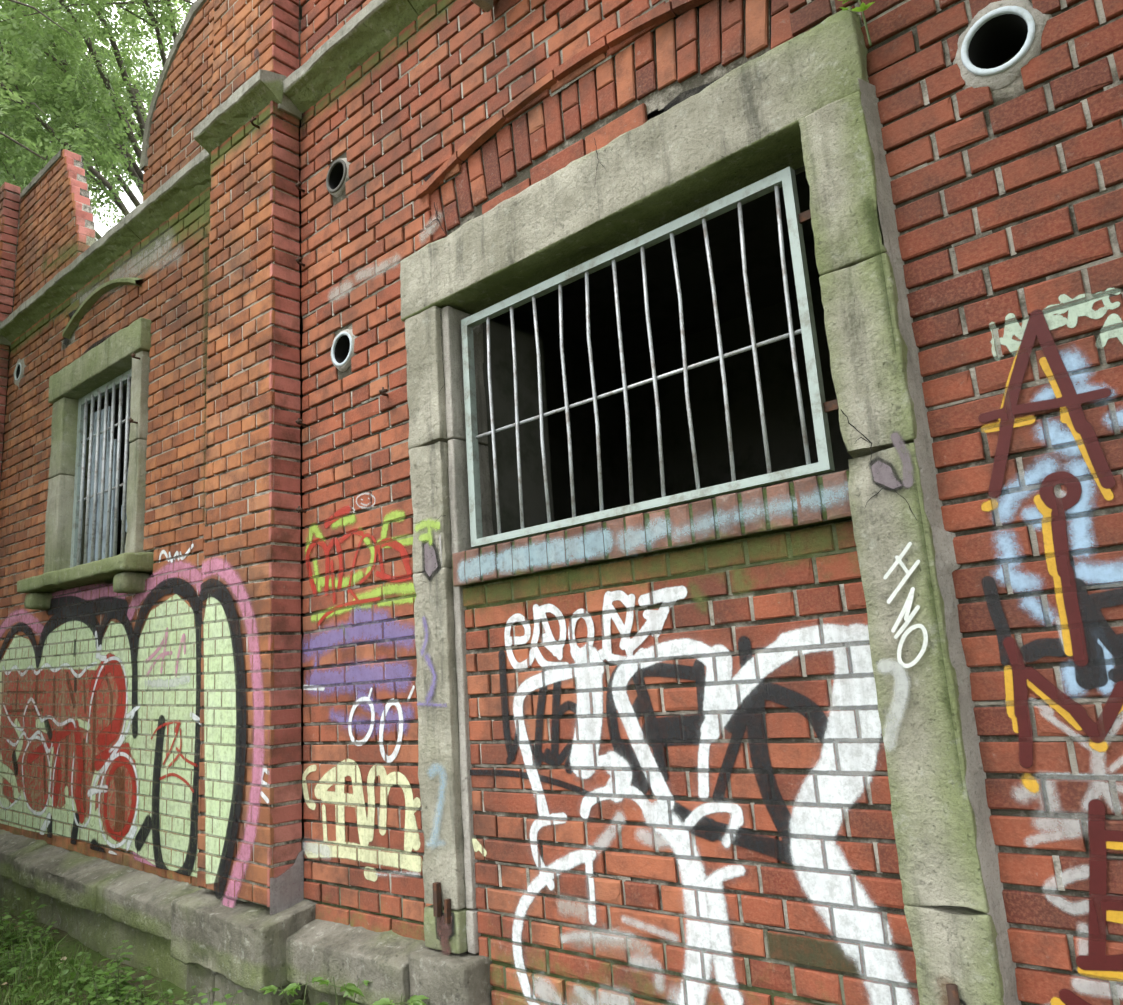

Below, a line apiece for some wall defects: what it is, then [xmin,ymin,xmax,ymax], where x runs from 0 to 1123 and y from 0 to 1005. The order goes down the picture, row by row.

water stain [330,256,396,299]
crack [841,410,872,464]
spalling [869,432,913,492]
rust [435,907,454,956]